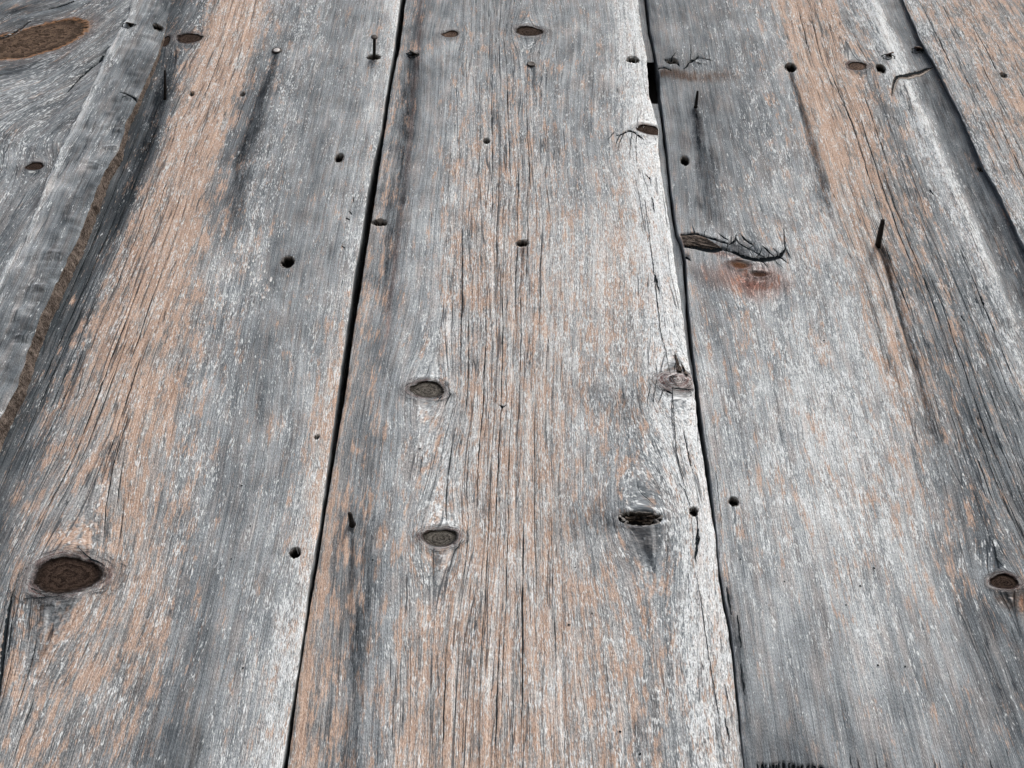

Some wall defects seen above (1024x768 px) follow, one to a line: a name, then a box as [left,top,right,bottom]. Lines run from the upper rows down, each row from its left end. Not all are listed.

crack [607,130,745,762]
crack [680,225,791,268]
crack [797,1,1024,545]